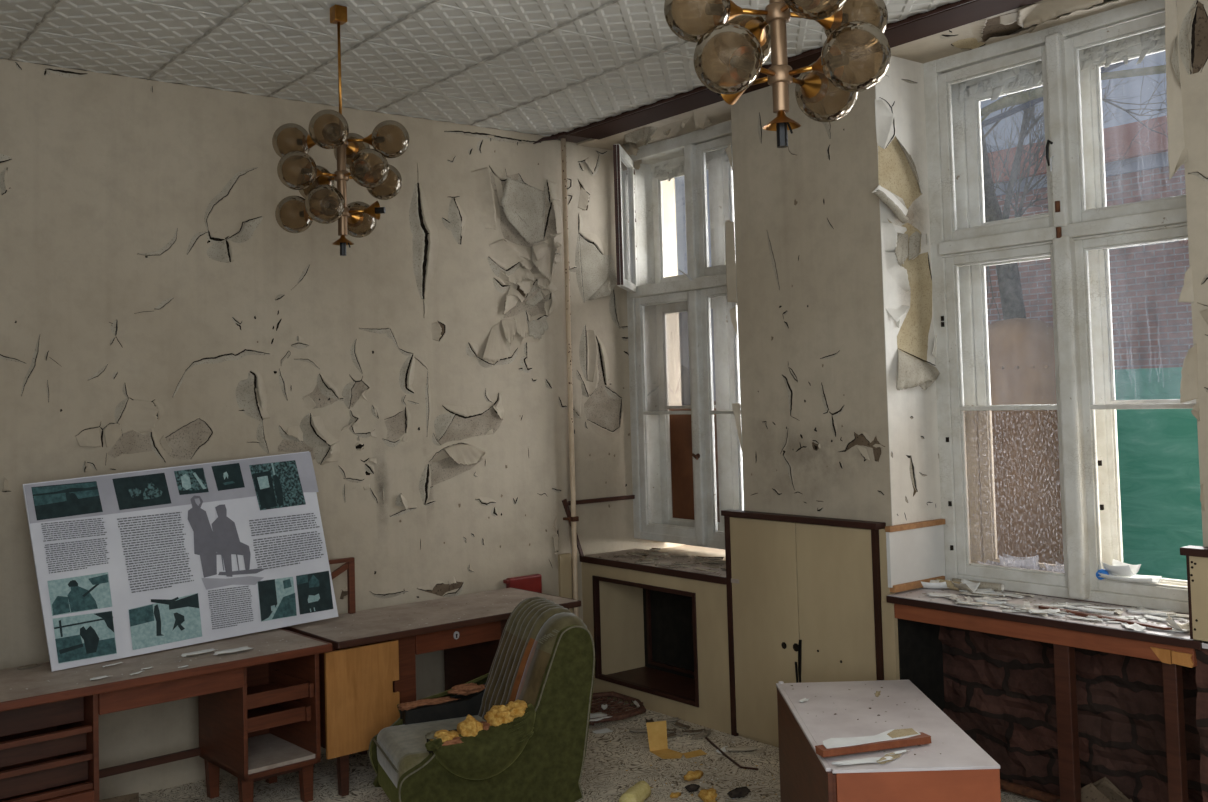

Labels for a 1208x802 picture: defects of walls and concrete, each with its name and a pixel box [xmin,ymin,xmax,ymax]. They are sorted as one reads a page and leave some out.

peeling [951,0,1146,52]
peeling [1081,0,1208,180]
crack [409,139,495,318]
peeling [442,112,719,368]
peeling [872,97,940,390]
crack [0,321,63,412]
crack [88,297,174,381]
crack [173,264,320,401]
peeling [235,324,412,465]
peeling [429,388,504,486]
peeling [568,325,624,439]
crack [752,350,845,512]